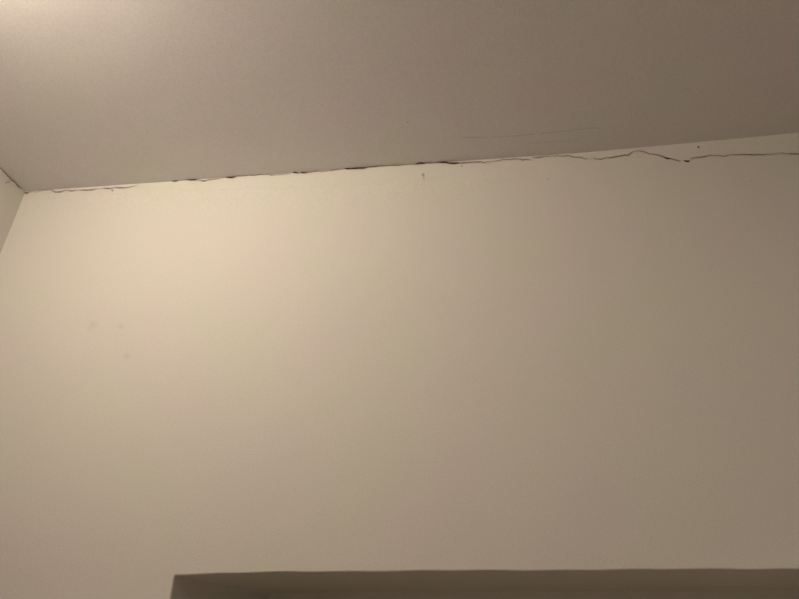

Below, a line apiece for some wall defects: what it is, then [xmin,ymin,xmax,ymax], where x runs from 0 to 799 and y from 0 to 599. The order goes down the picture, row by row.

crack [601,152,761,163]
crack [172,161,482,183]